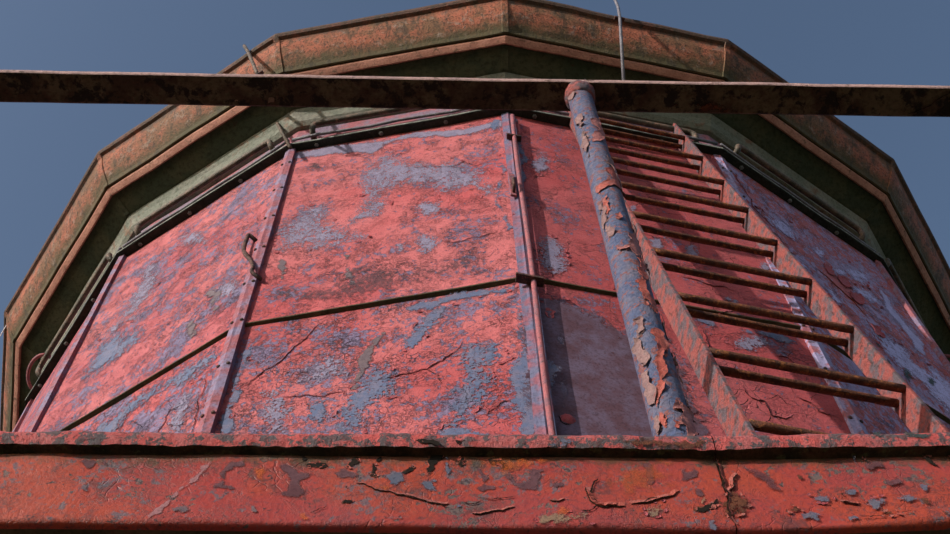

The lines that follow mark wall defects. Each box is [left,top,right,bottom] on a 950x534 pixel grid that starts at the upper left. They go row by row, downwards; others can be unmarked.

peeling [273,119,552,255]
peeling [93,344,221,433]
peeling [218,347,252,434]
crack [240,320,324,388]
peeling [258,352,399,435]
peeling [401,283,535,442]
peeling [534,154,710,446]
crack [727,350,836,422]
peeling [811,245,950,417]
peeling [279,458,437,497]
crack [549,479,679,511]
crack [714,457,740,524]